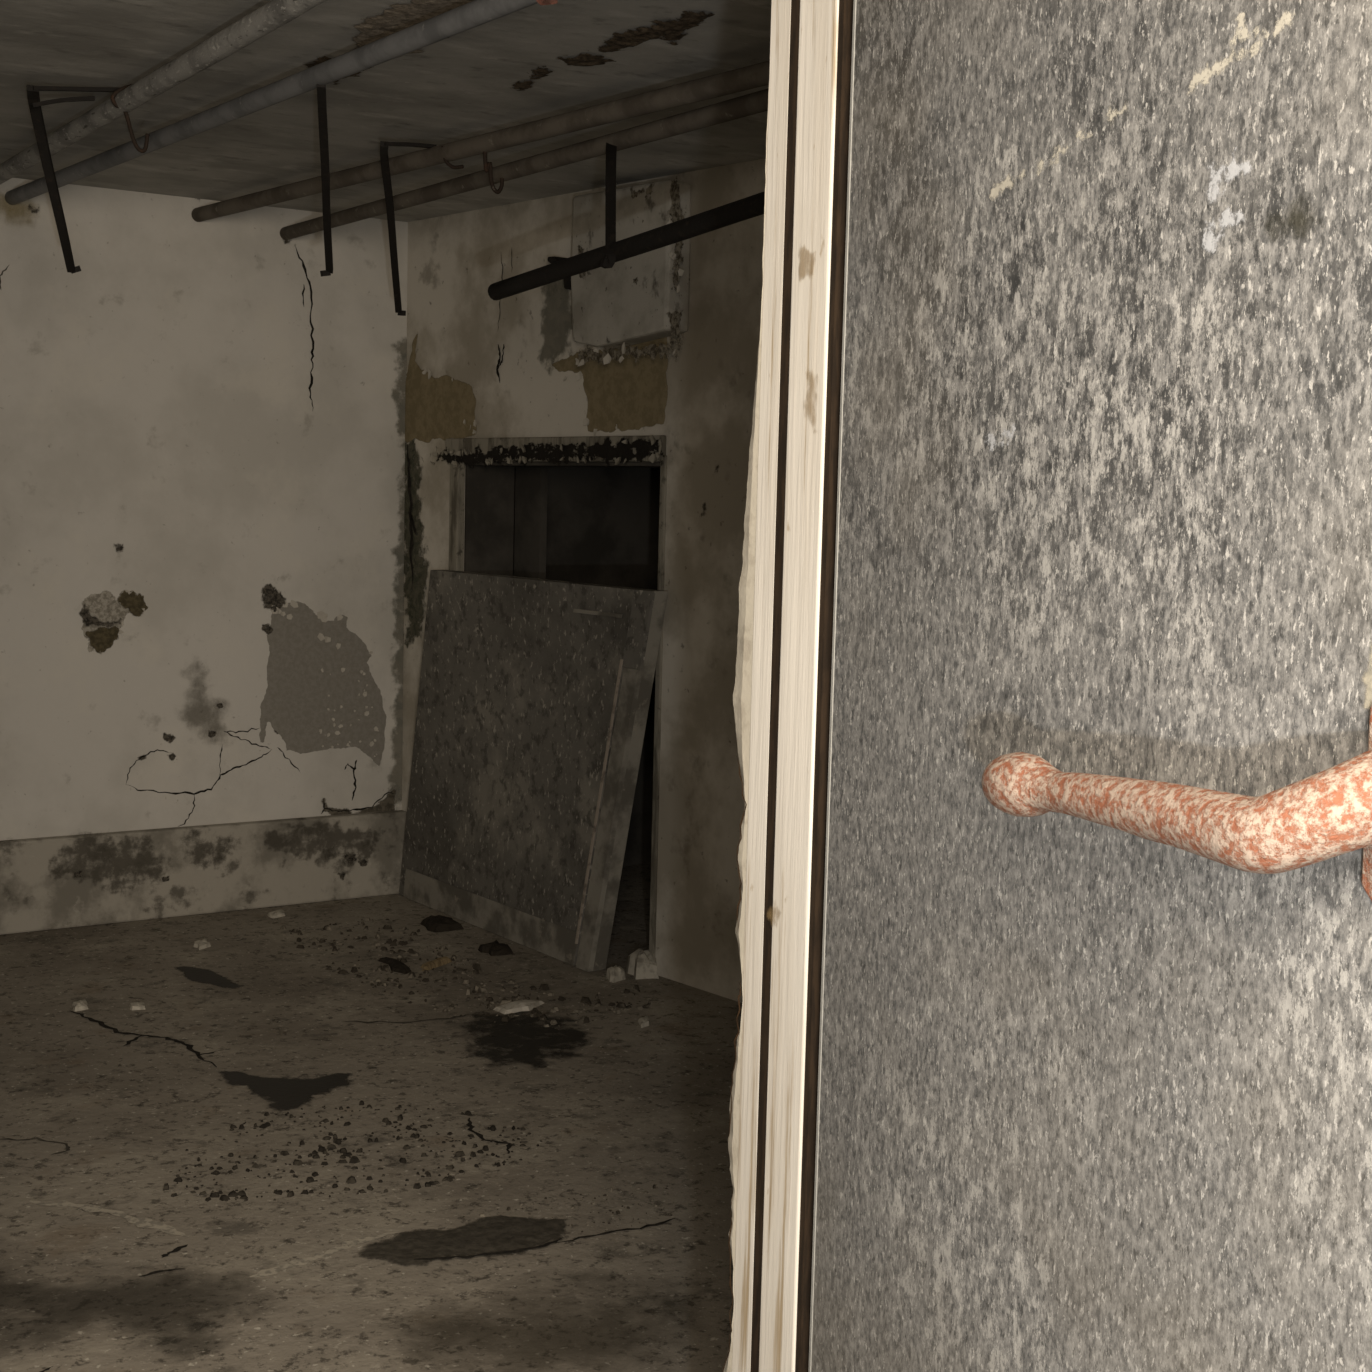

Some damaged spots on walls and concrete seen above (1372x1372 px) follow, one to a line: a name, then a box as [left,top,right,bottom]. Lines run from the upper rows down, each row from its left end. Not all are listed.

peeling [630,178,684,225]
peeling [671,241,684,293]
crack [295,246,314,407]
peeling [405,311,684,467]
spalling [80,590,148,654]
peeling [259,584,386,766]
crack [126,728,299,826]
crack [321,760,393,814]
crack [71,1011,217,1067]
damp [462,1011,588,1068]
damp [220,1071,352,1111]